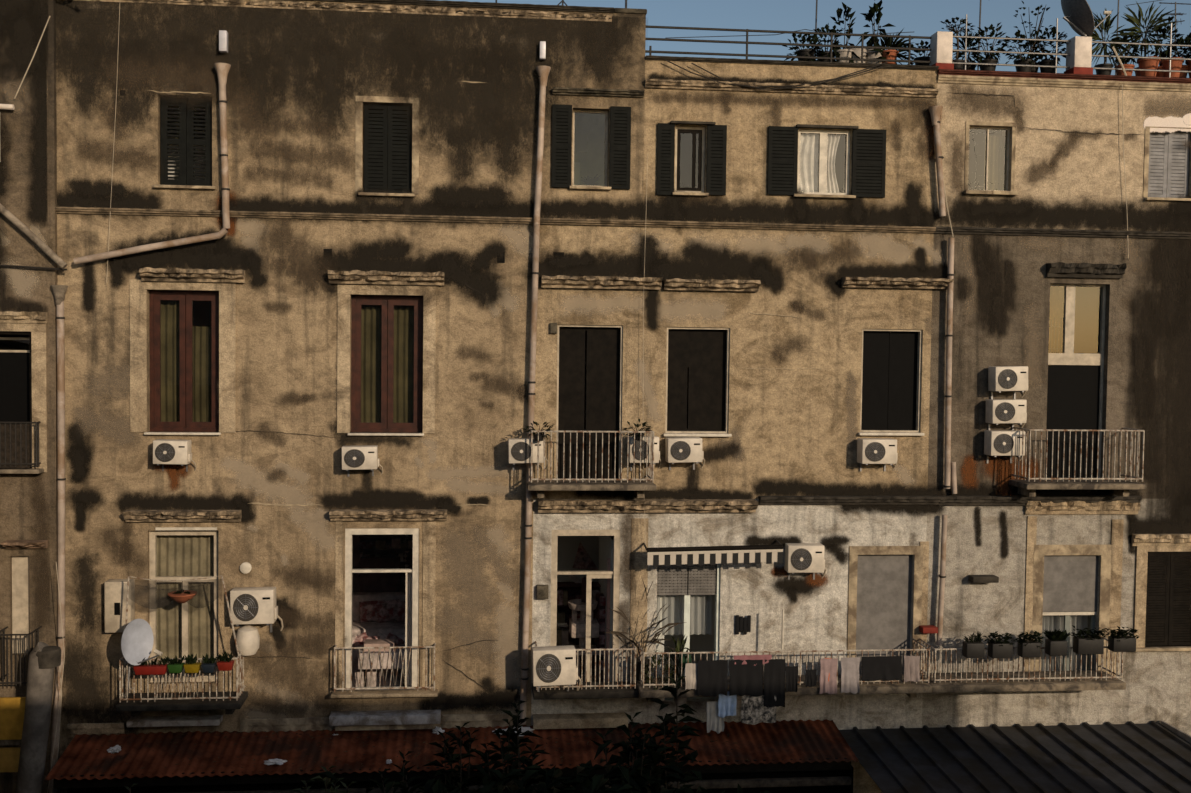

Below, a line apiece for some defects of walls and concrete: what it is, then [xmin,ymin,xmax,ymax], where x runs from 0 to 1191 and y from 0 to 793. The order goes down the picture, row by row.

flaking render [1143,97,1191,133]
damp [0,0,1191,558]
corrosion [151,456,189,490]
damp [32,474,49,625]
damp [103,492,255,572]
damp [621,514,635,590]
damp [821,536,849,564]
corrosion [771,567,788,576]
damp [774,576,816,603]
corrosion [807,573,828,586]
damp [619,604,630,648]